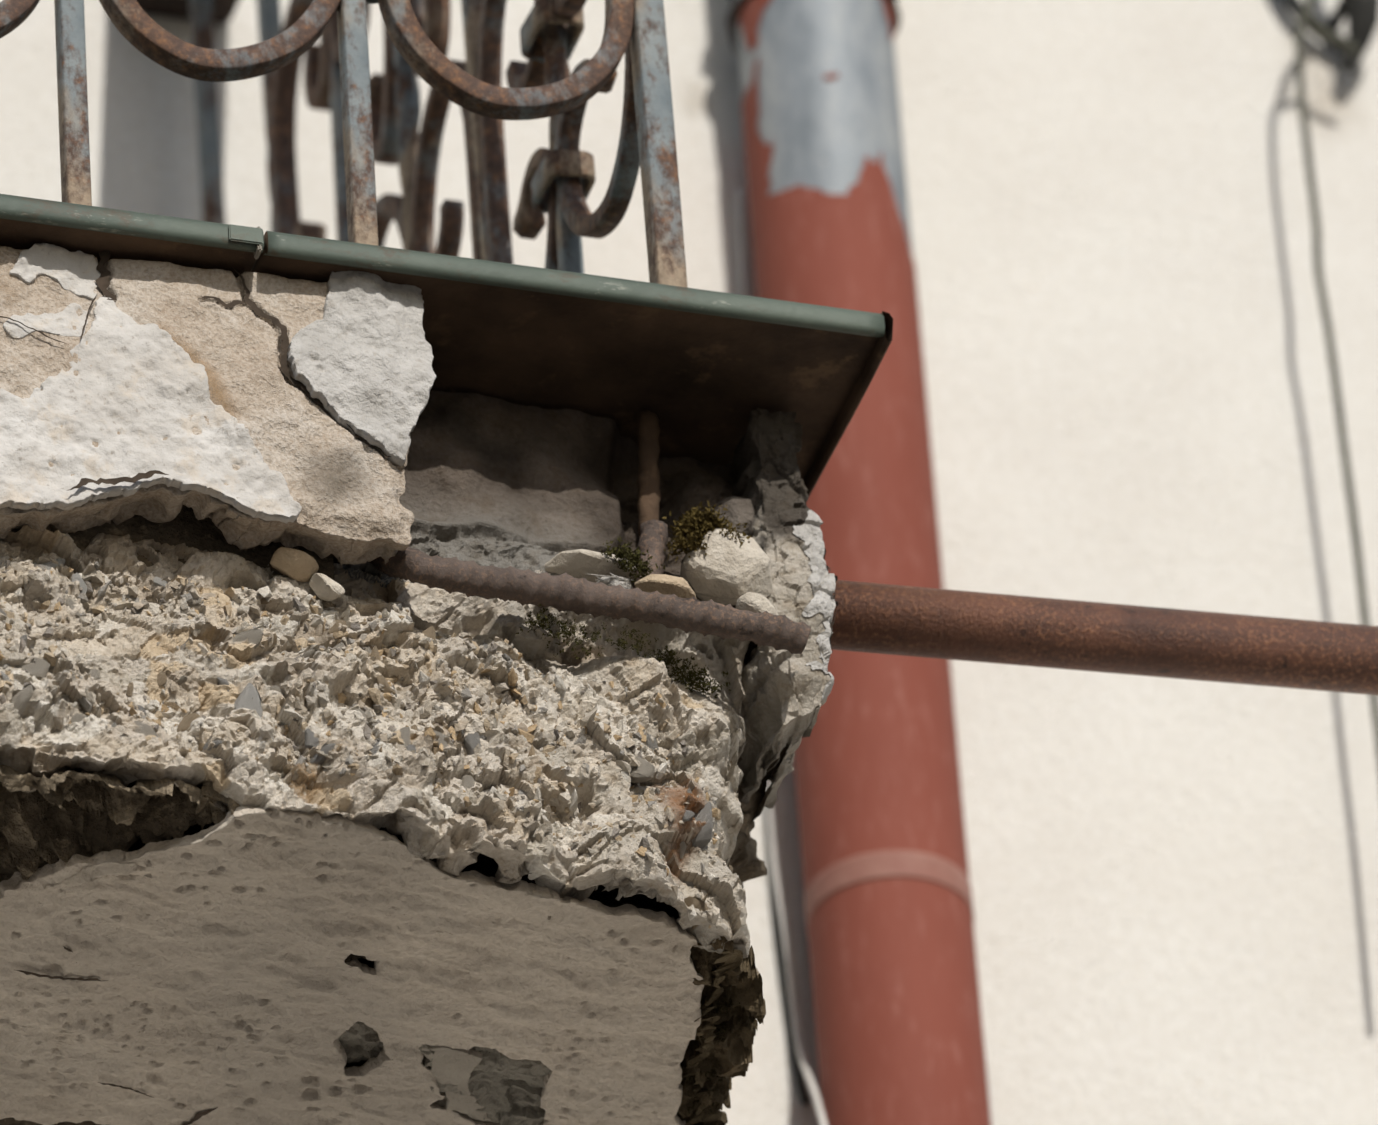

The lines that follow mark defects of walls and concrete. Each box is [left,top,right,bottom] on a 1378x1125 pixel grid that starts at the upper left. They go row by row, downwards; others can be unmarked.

spalling [0,243,836,1125]